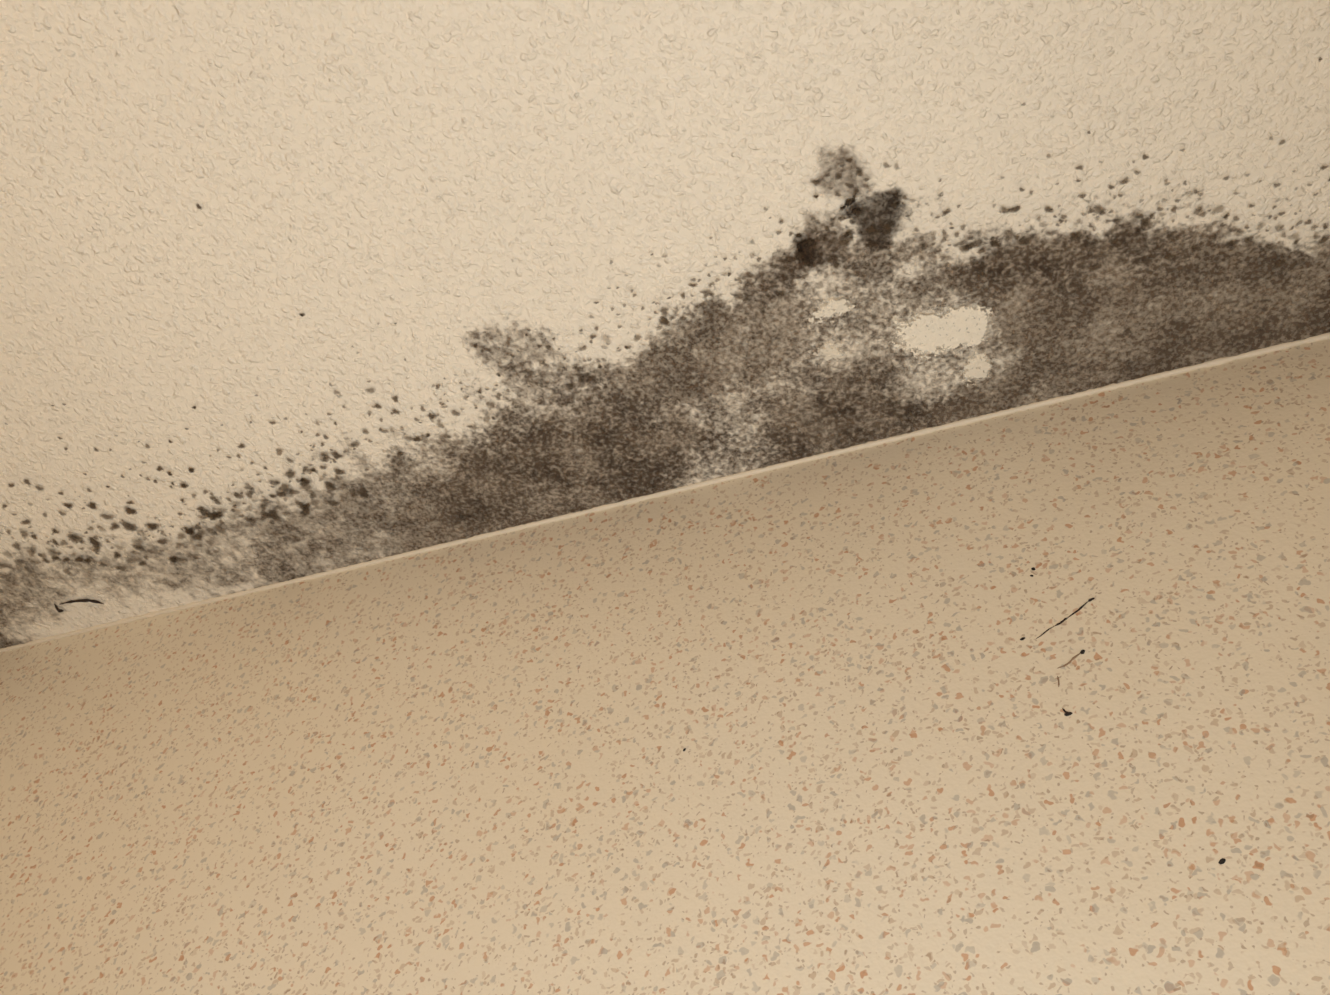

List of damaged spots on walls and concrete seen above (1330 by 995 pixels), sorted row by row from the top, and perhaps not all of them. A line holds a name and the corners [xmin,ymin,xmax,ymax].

leakage [0,149,1330,649]